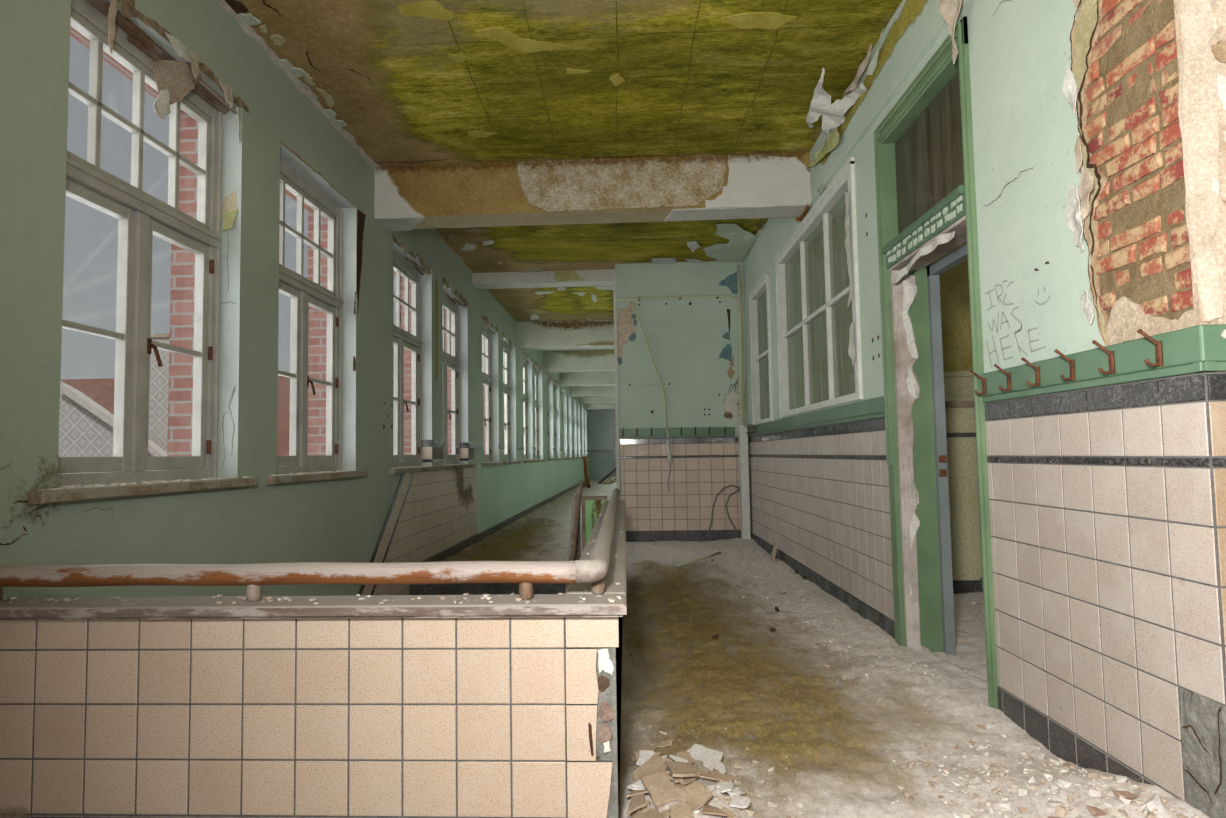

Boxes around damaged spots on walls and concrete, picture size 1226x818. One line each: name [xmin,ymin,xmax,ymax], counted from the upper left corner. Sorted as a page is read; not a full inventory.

spalling [98,0,249,114]
water stain [369,0,927,173]
peeling [721,12,797,29]
spalling [516,30,883,307]
spalling [1062,0,1226,345]
water stain [480,218,768,264]
water stain [533,286,614,330]
water stain [559,342,614,357]
spalling [718,309,740,417]
peeling [887,195,962,600]
crack [0,500,44,545]
spalling [588,647,618,818]